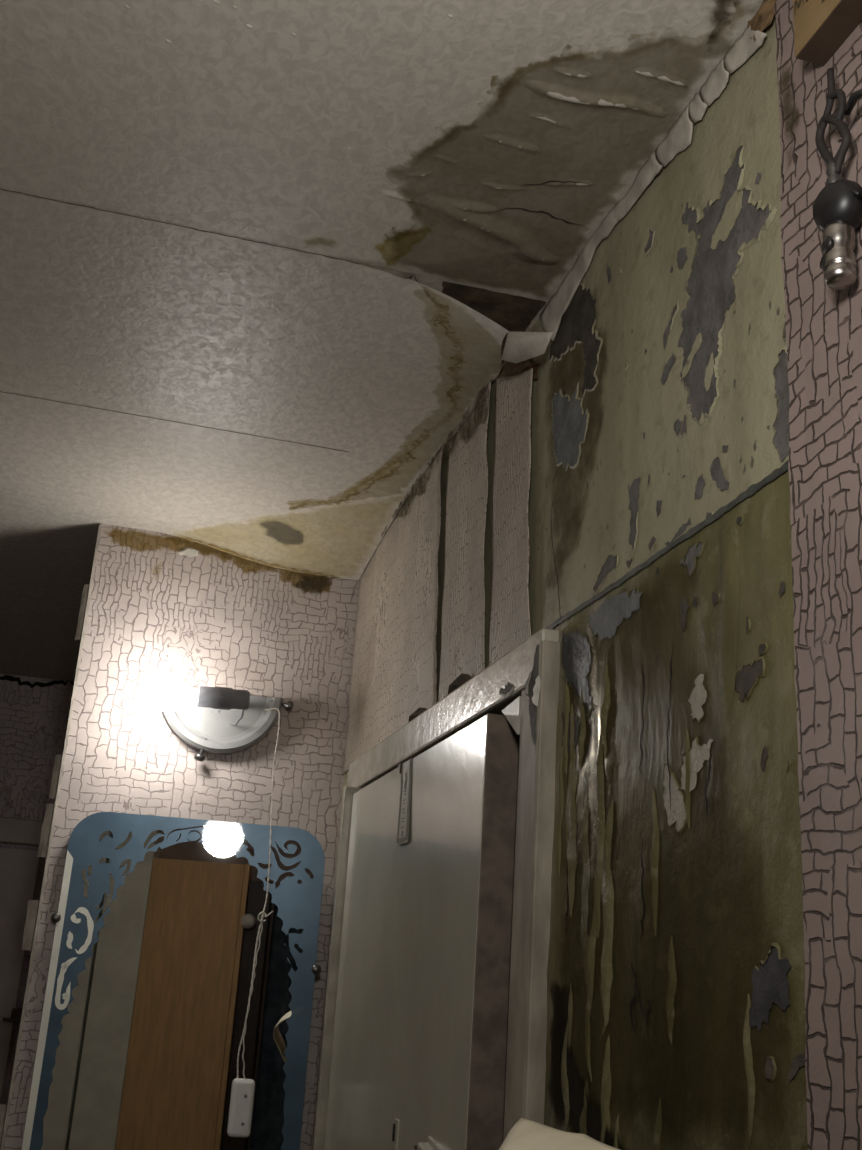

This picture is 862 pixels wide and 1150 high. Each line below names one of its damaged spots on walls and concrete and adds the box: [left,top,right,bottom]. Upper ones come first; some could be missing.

peeling [549,283,603,471]
peeling [680,445,729,500]
peeling [661,144,778,437]
peeling [772,316,790,462]
peeling [735,642,769,702]
peeling [556,474,721,1150]
leakage [550,987,621,1149]
flaking render [743,942,791,1150]